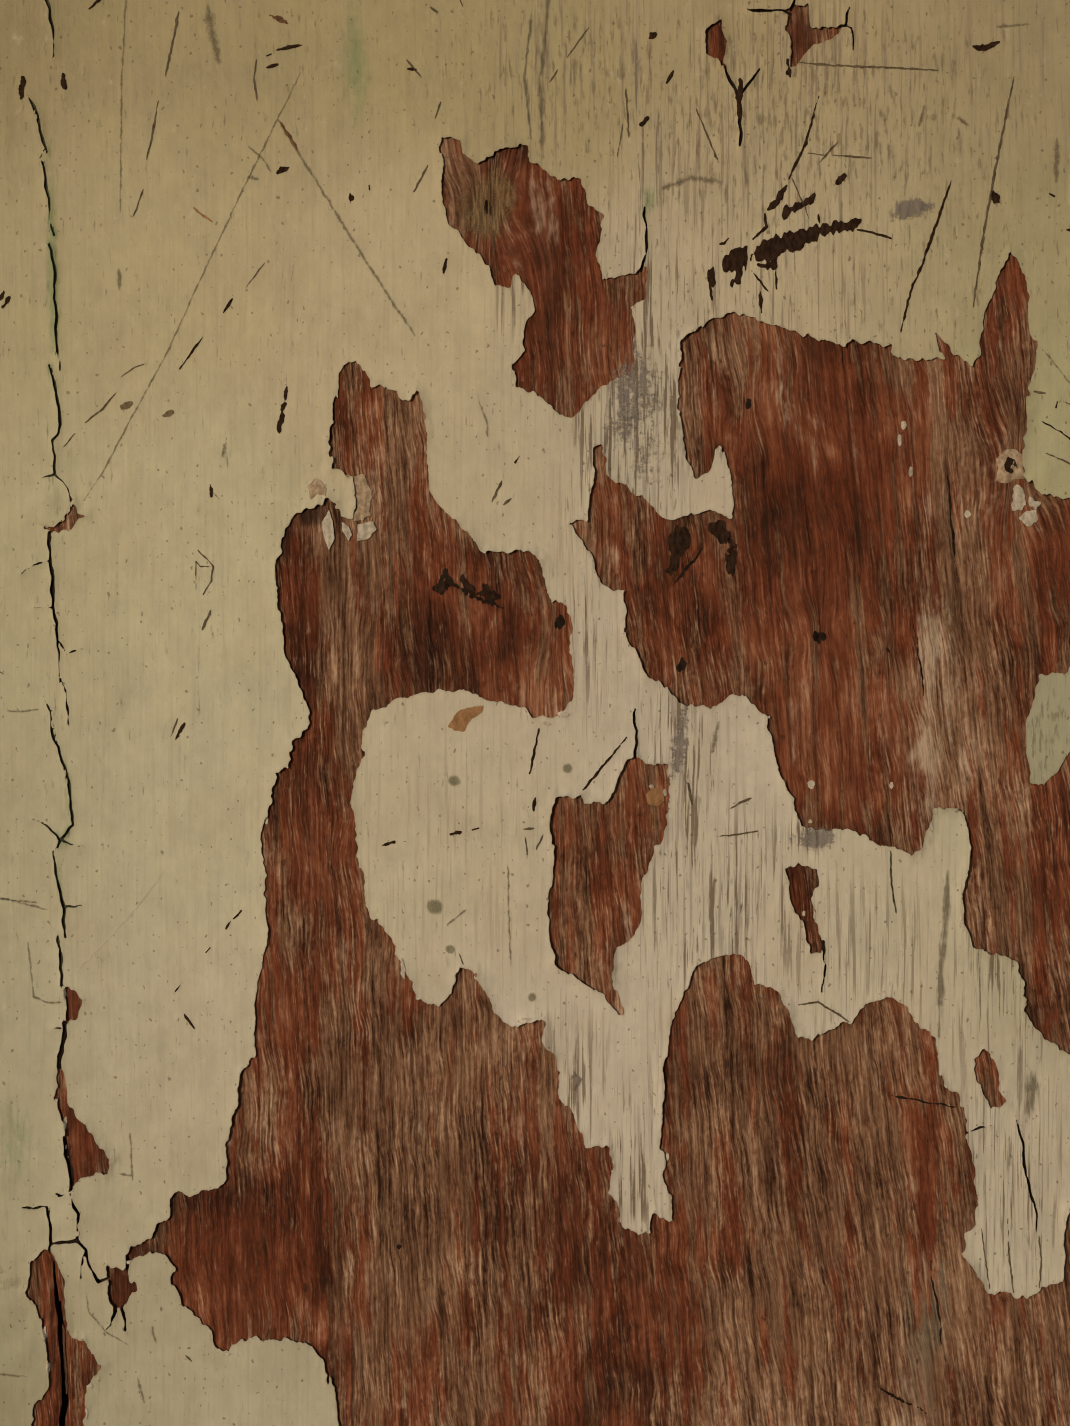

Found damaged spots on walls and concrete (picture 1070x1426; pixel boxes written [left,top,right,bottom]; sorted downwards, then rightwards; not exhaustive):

crack [45,0,54,45]
peeling [785,4,848,67]
crack [29,98,70,494]
peeling [439,137,648,418]
crack [22,526,82,986]
crack [56,1021,67,1069]
peeling [56,981,82,1038]
peeling [54,1060,109,1195]
peeling [100,361,1070,1426]
peeling [570,193,1070,1054]
peeling [25,1242,101,1426]
crack [23,1137,130,1426]